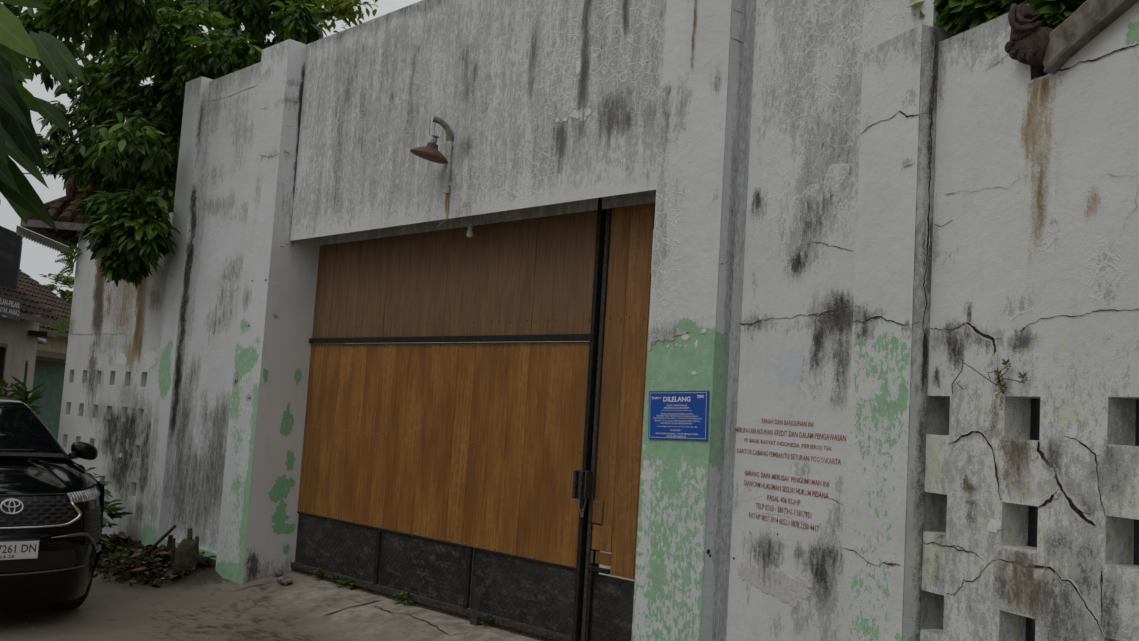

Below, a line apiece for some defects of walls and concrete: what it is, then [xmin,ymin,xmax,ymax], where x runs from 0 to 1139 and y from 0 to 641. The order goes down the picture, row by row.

damp [555,0,682,173]
rust [1021,75,1056,241]
damp [785,192,833,278]
crack [738,37,1139,394]
damp [87,258,110,402]
damp [171,187,226,527]
flaking render [647,328,707,352]
damp [809,295,867,404]
damp [98,409,151,493]
peeling [268,450,295,555]
peeling [280,402,294,436]
damp [794,530,843,605]